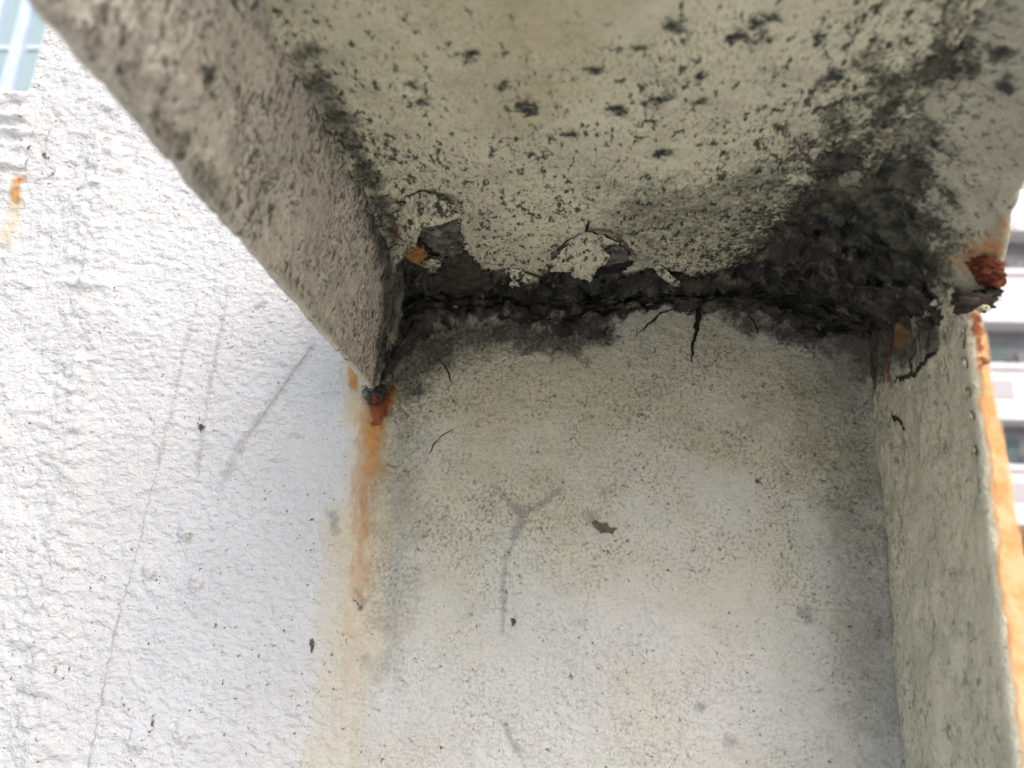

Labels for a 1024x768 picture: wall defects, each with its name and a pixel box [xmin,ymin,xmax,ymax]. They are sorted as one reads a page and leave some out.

rust [11,177,24,201]
water stain [293,3,1018,400]
spalling [393,191,636,294]
peeling [651,265,682,287]
rust [963,244,1007,288]
crack [636,307,702,363]
crack [894,349,938,383]
rust [363,385,395,477]
crack [891,411,905,431]
rust [971,311,1024,750]